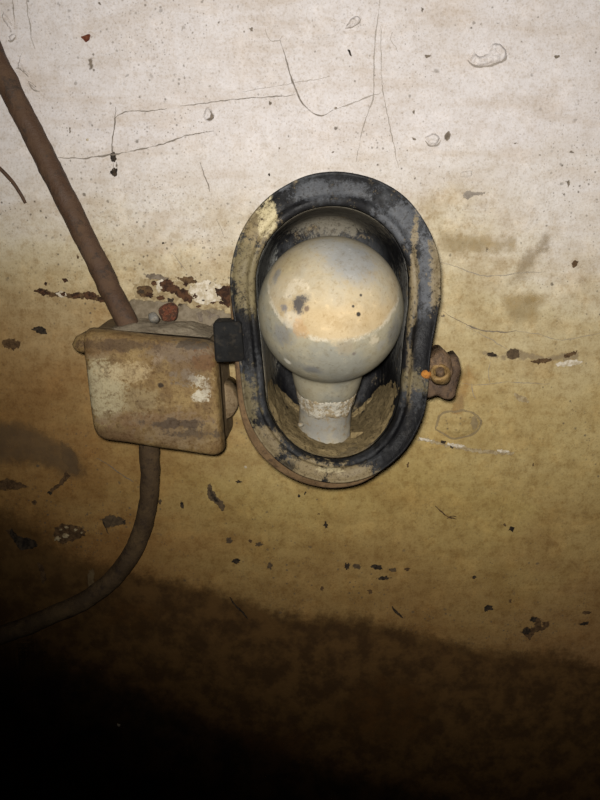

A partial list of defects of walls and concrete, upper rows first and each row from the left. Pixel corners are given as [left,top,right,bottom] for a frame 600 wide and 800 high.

crack [58,40,398,177]
peeling [133,273,230,310]
spalling [484,349,583,367]
spalling [53,523,86,544]
spalling [521,616,549,640]